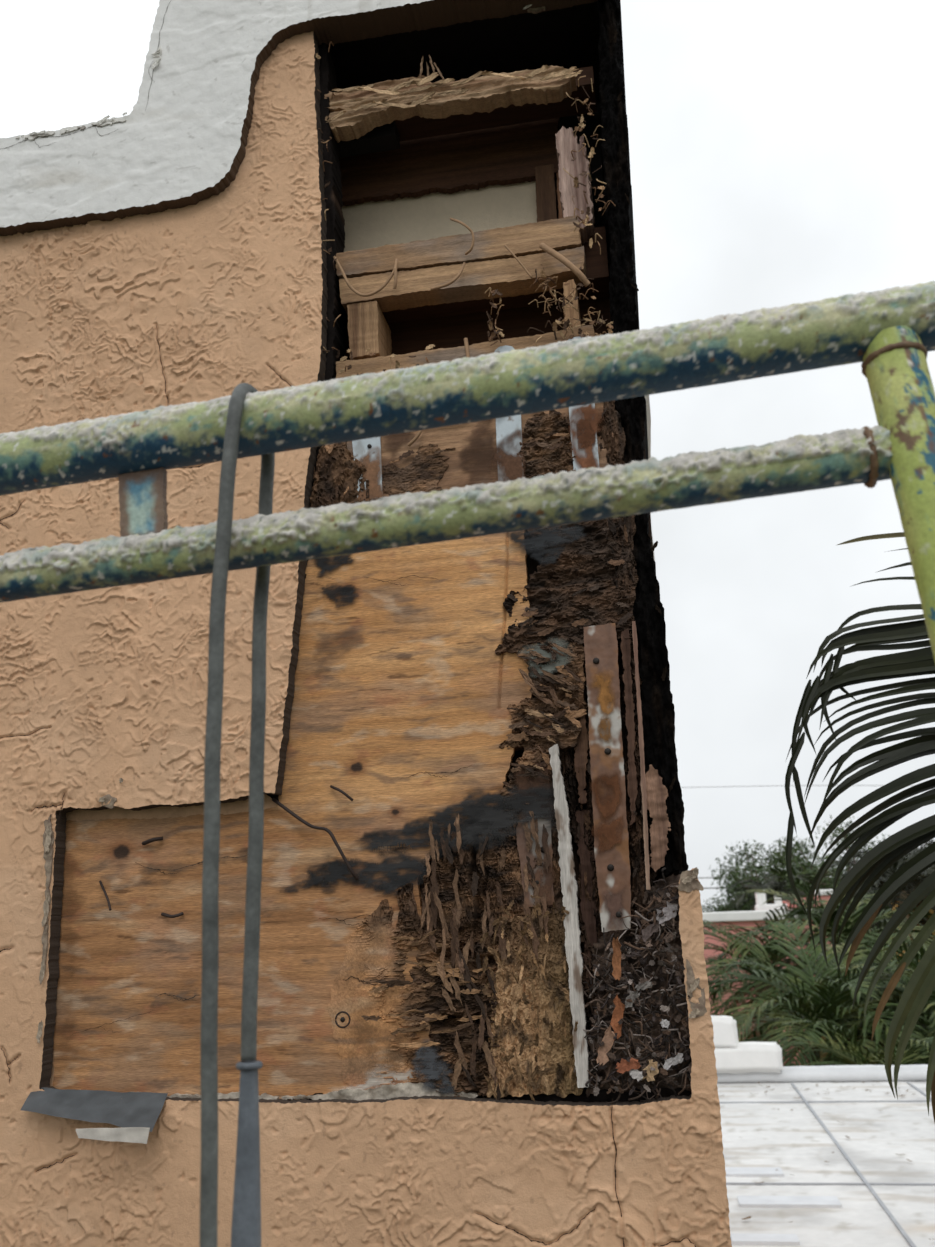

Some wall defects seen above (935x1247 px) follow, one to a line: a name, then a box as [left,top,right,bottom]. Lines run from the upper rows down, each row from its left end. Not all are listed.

spalling [343,329,351,361]
spalling [388,302,564,355]
spalling [578,297,611,335]
rust [570,404,602,469]
peeling [507,594,589,736]
peeling [506,707,534,741]
rust [593,674,614,741]
peeling [518,749,563,770]
rust [592,773,623,852]
spalling [39,814,55,984]
rust [604,891,624,928]
spalling [573,867,707,1104]